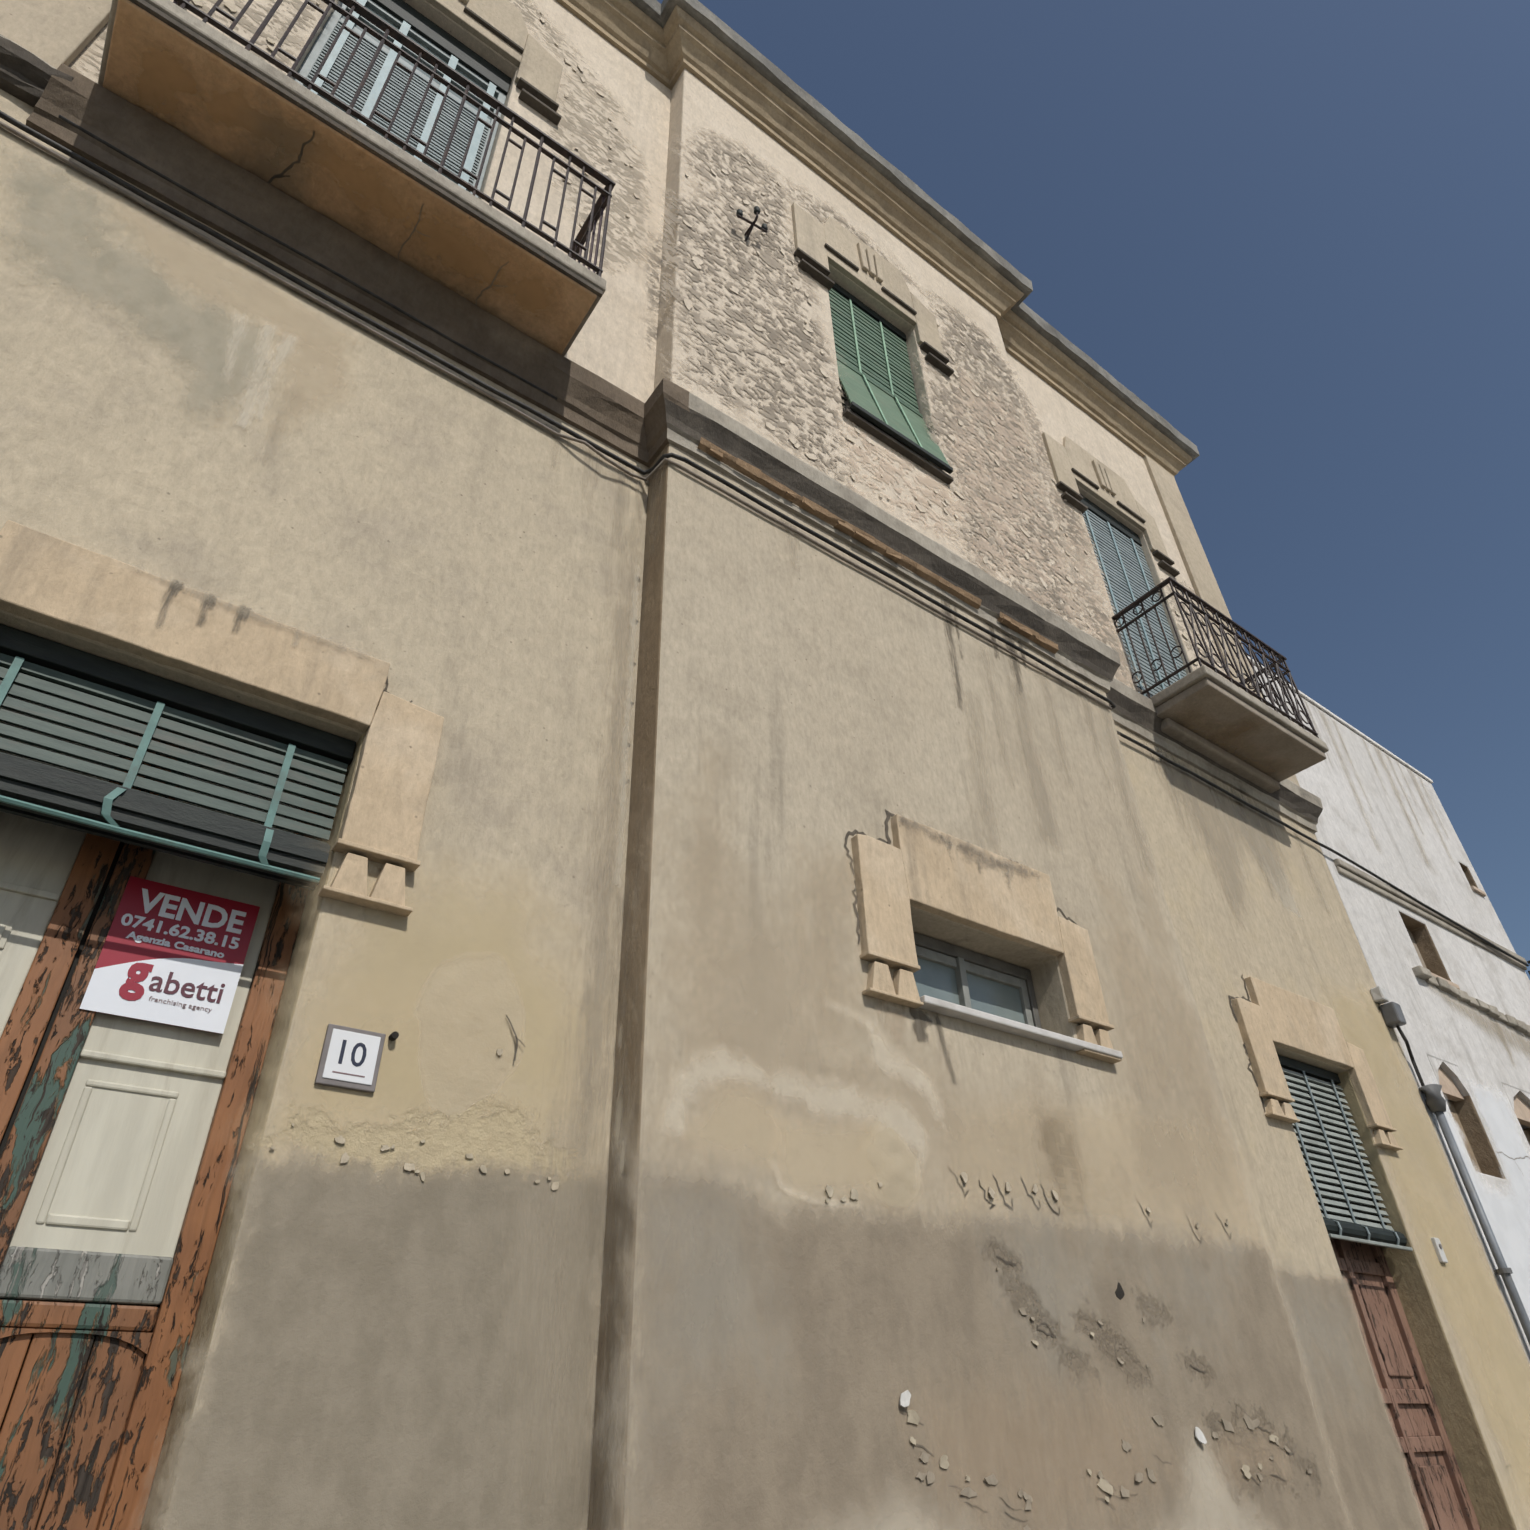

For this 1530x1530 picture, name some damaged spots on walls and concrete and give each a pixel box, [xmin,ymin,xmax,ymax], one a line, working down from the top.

peeling [507,0,1144,692]
water stain [162,580,184,615]
water stain [198,594,265,628]
peeling [261,1090,580,1191]
peeling [948,1168,1060,1215]
peeling [1441,1087,1530,1320]
flaking render [900,1390,1033,1530]
flaking render [1086,1455,1172,1510]
water stain [1186,1450,1250,1530]
flaking render [1195,1405,1321,1496]